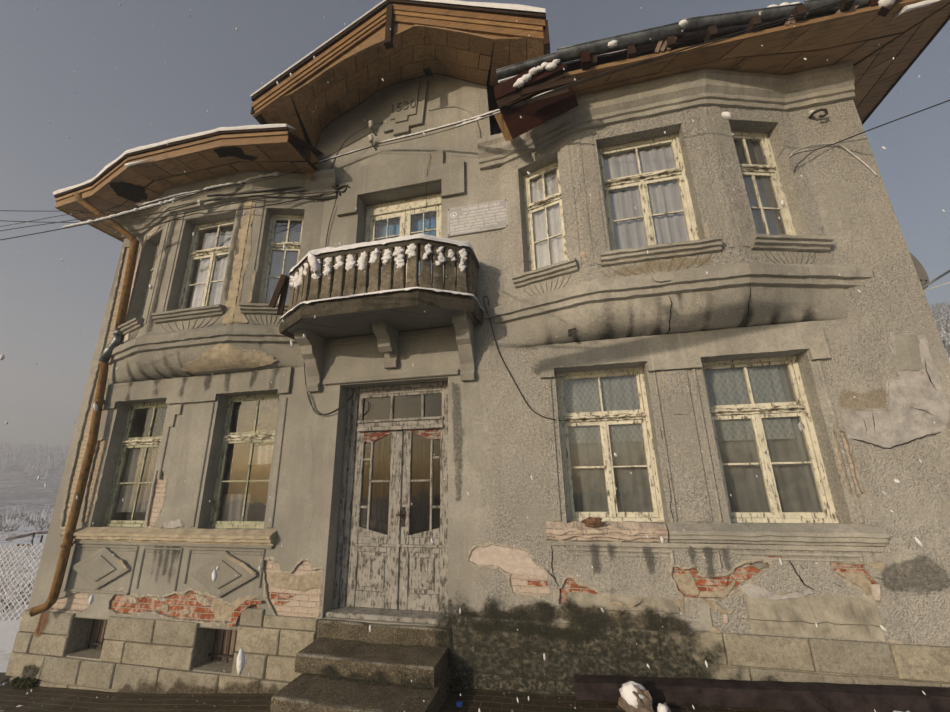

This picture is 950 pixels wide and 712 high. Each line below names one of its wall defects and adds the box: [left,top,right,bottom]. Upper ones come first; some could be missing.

flaking render [107,554,324,627]
flaking render [467,542,609,606]
damp [591,545,613,572]
damp [644,548,654,570]
damp [689,547,729,578]
flaking render [668,551,813,633]
flaking render [827,558,887,604]
damp [883,557,948,592]
damp [435,598,722,695]